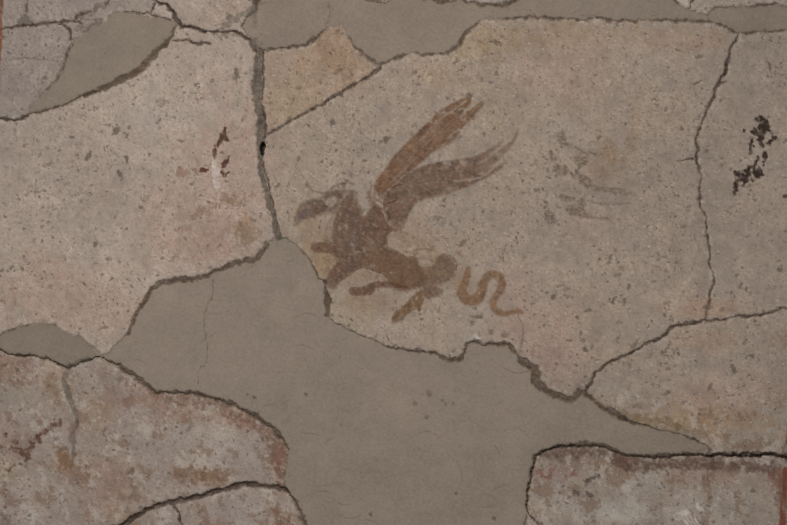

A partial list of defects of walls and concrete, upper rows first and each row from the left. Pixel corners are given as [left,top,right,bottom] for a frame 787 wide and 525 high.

crack [3,0,89,41]
crack [0,115,30,123]
crack [108,0,382,241]
water stain [730,113,779,197]
crack [585,33,787,395]
crack [60,356,93,472]
crack [707,452,787,462]
crack [122,482,291,525]